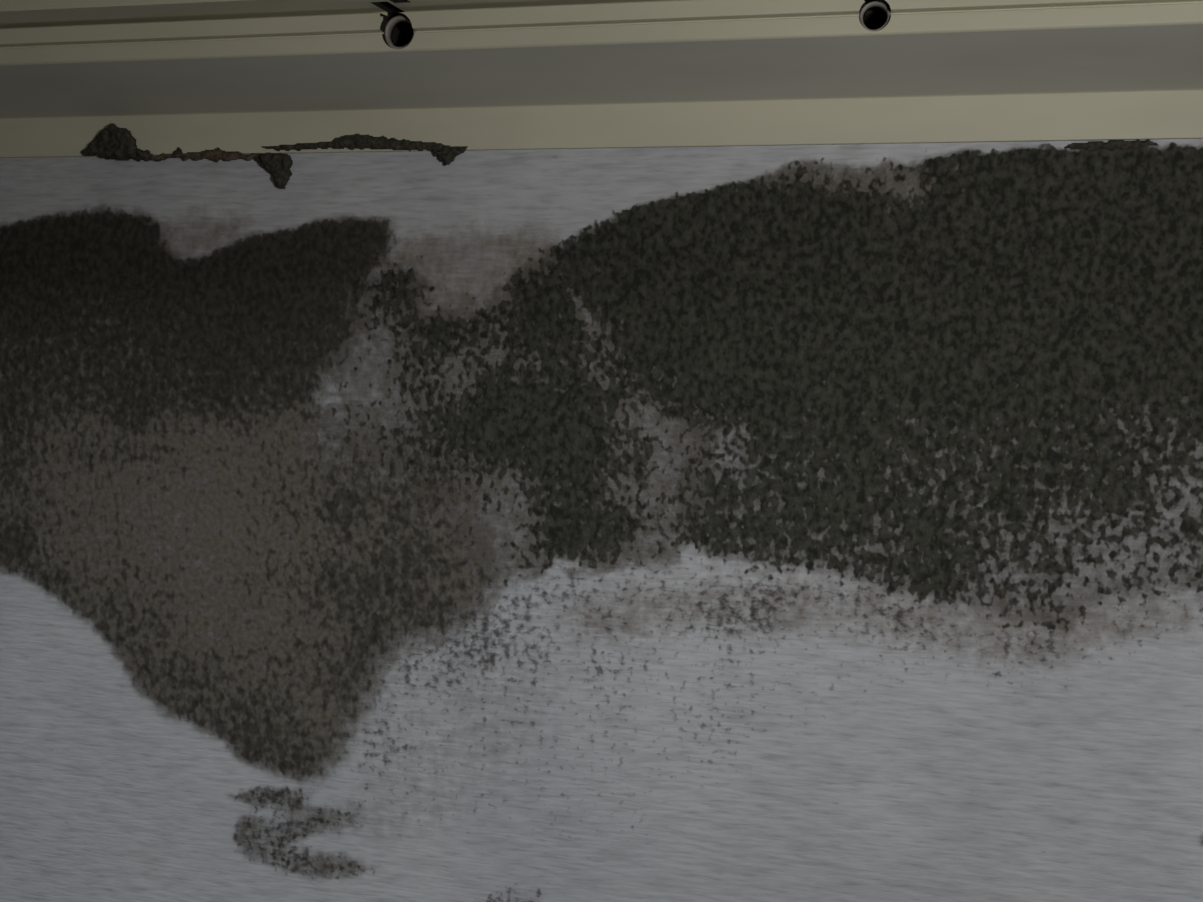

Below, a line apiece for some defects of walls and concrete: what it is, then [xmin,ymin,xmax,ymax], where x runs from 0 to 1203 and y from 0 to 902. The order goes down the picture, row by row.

damp [0,142,1203,781]
damp [235,787,360,877]